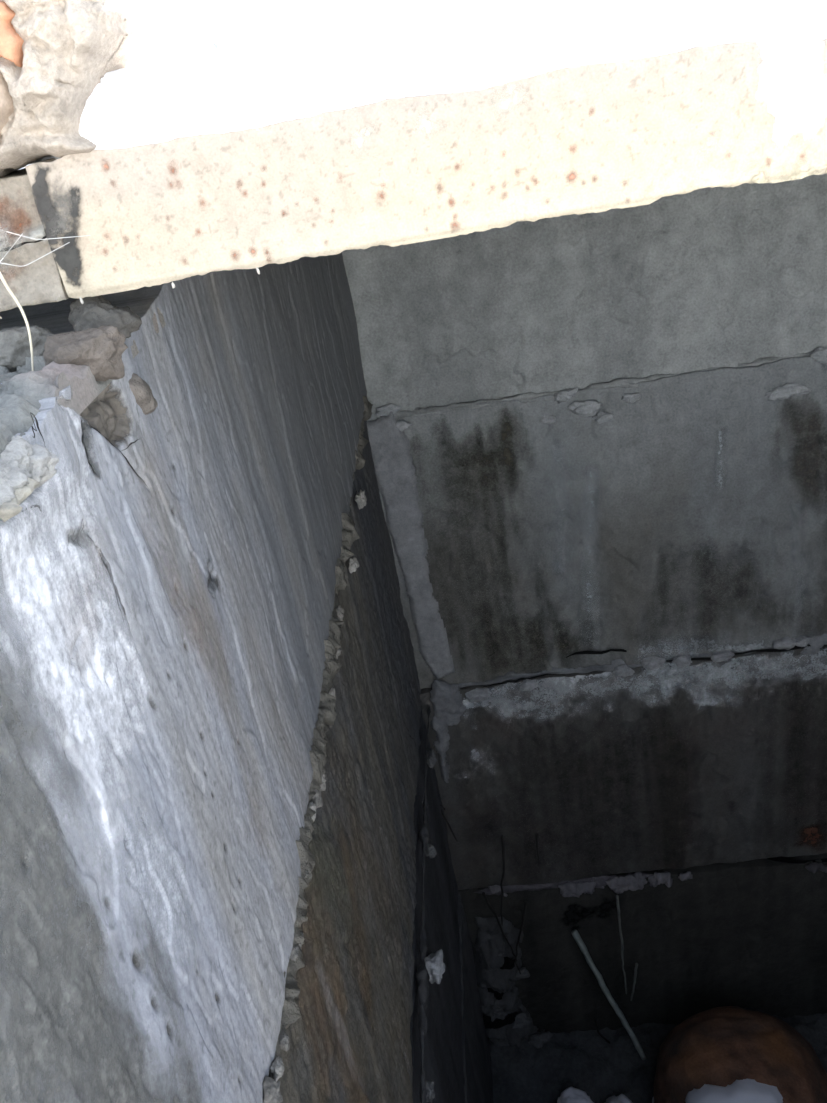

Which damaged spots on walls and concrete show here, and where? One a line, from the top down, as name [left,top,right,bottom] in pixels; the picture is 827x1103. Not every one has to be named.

spalling [79,373,158,478]
damp [441,409,518,557]
damp [785,398,827,501]
spalling [68,530,89,544]
crack [483,649,627,687]
damp [463,551,827,719]
crack [666,644,827,662]
crack [766,856,827,864]